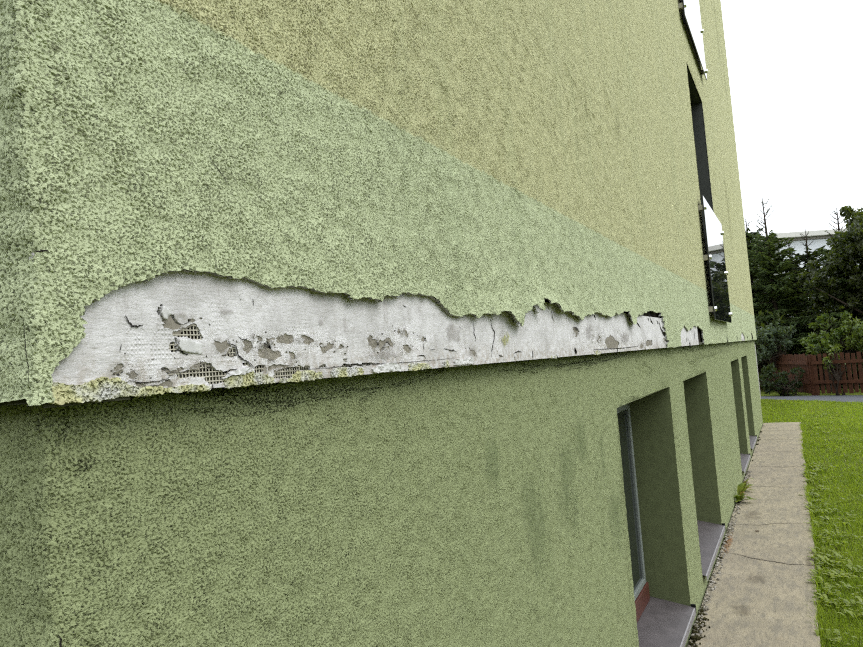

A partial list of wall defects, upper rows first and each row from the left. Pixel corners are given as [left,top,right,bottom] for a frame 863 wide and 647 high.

peeling [45,269,668,405]
peeling [680,326,699,348]